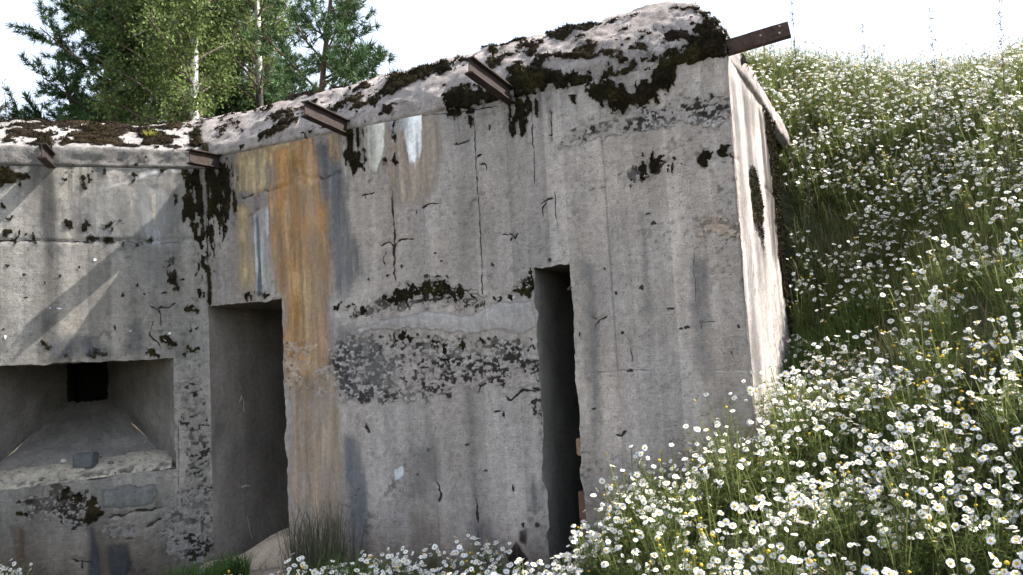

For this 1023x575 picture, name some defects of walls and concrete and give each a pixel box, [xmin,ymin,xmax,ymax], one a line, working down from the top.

crack [362,191,413,280]
rust [234,134,340,528]
spalling [337,273,488,320]
spalling [284,327,542,426]
spalling [16,483,101,530]
spalling [160,376,214,566]